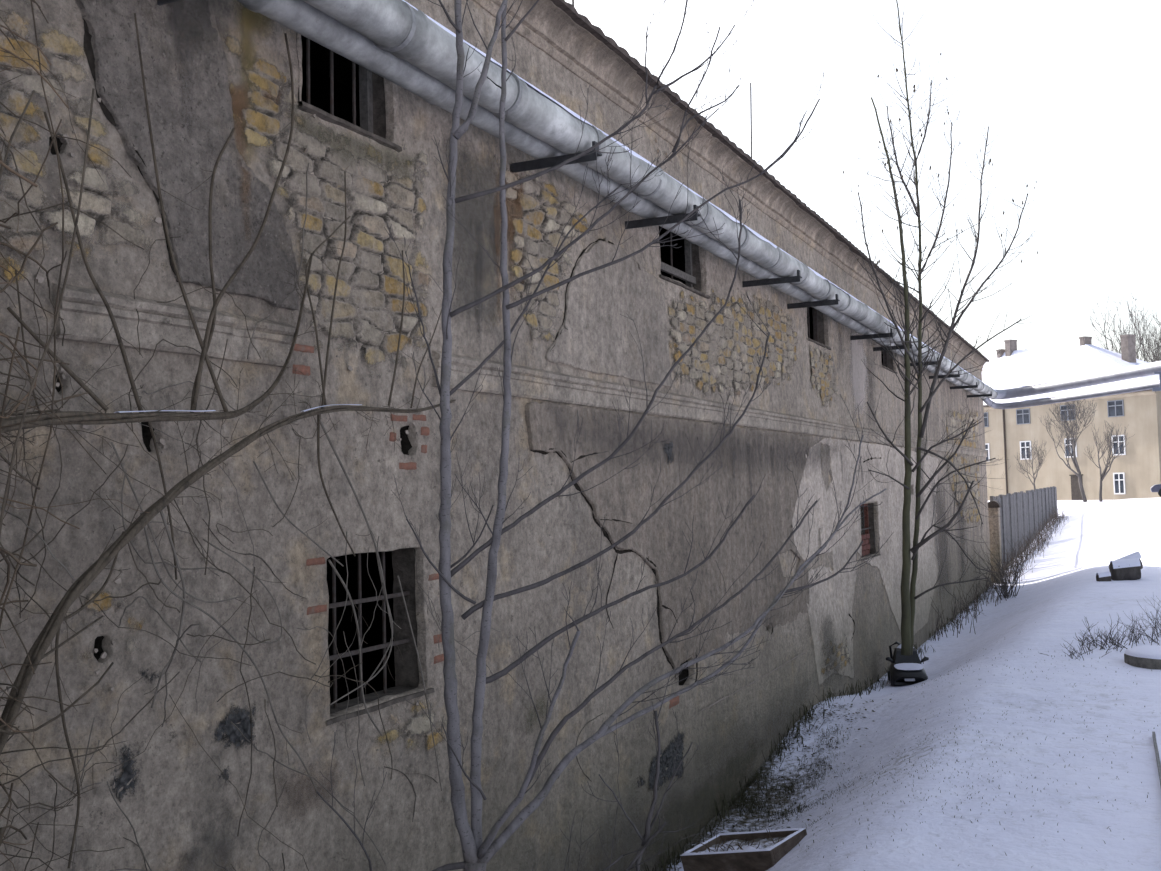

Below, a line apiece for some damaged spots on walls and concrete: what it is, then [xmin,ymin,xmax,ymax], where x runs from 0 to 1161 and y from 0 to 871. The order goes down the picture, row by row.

crack [83,18,178,282]
peeling [0,0,434,376]
peeling [496,160,838,407]
flaking render [389,414,430,470]
crack [531,448,678,669]
spalling [637,732,685,791]